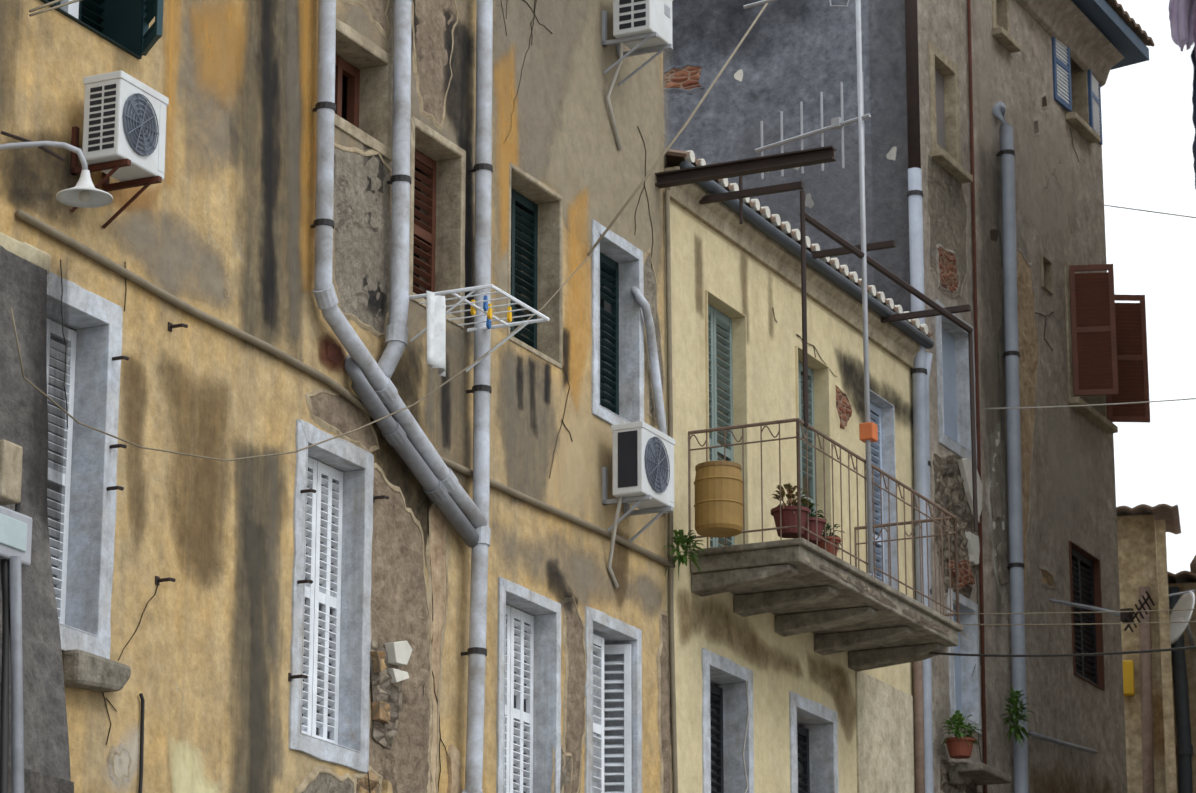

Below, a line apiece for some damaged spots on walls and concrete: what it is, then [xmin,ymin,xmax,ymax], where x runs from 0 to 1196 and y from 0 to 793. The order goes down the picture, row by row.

water stain [194,0,317,344]
corrosion [320,336,347,371]
peeling [339,0,394,56]
spalling [294,388,463,793]
peeling [407,300,426,340]
spalling [411,0,475,208]
spalling [503,536,672,793]
peeling [492,0,706,425]
water stain [680,595,853,726]
spalling [925,152,968,299]
spalling [931,421,1009,610]
spalling [1016,247,1056,621]